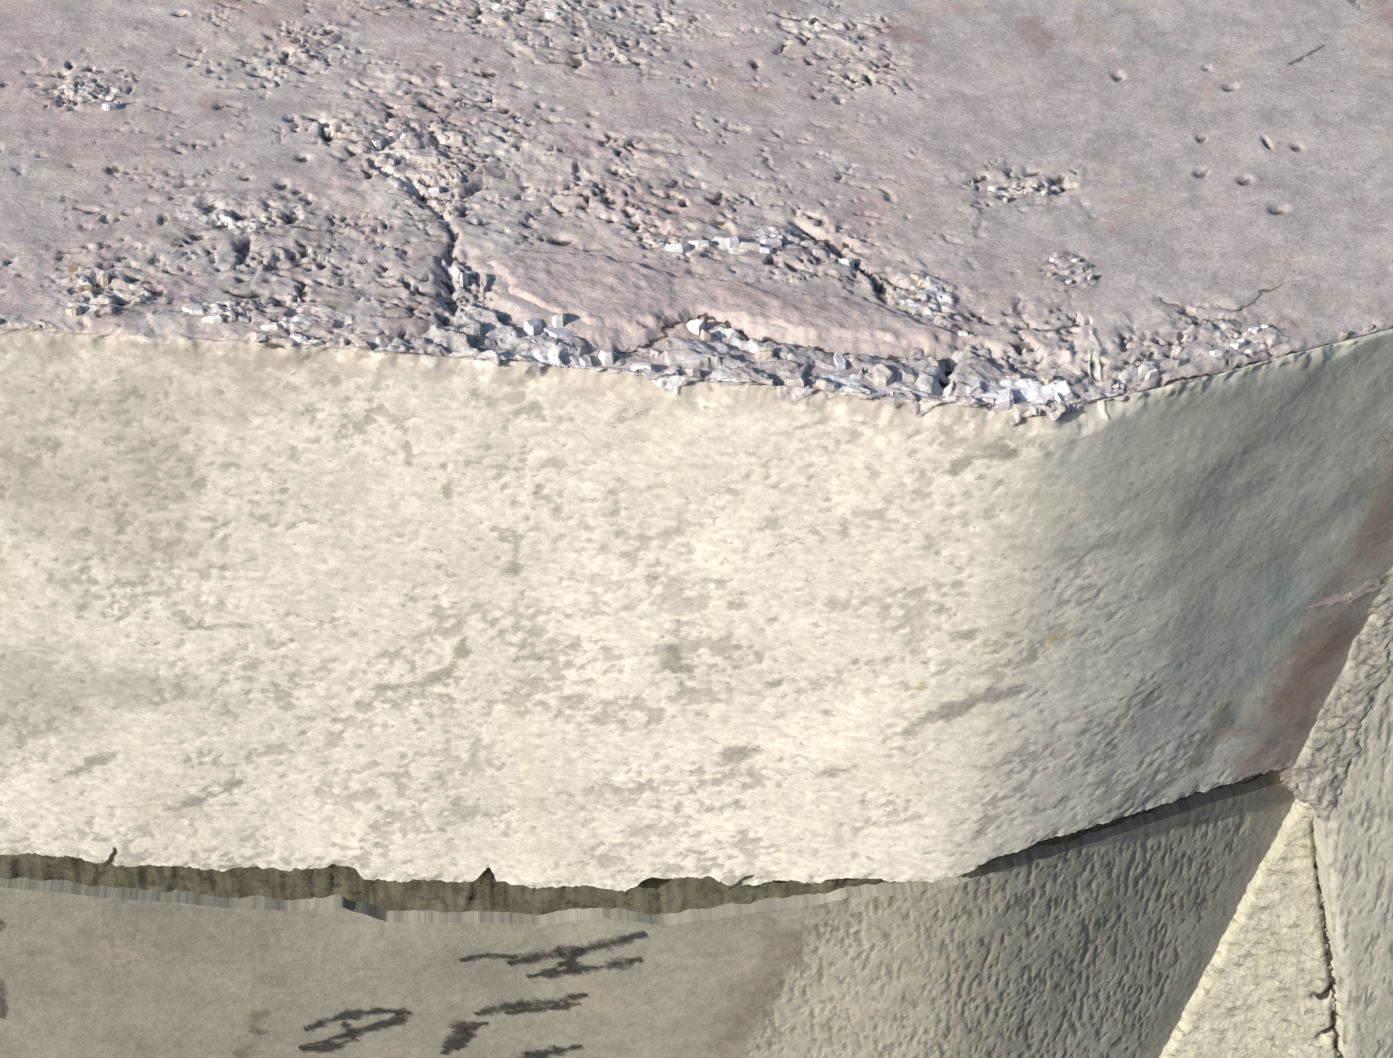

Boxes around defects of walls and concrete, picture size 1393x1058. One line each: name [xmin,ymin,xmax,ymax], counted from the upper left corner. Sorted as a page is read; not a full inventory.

spalling [0,313,57,331]
spalling [161,177,308,241]
crack [377,125,487,323]
spalling [58,221,1289,426]
spalling [978,173,1064,203]
crack [1313,829,1343,1058]